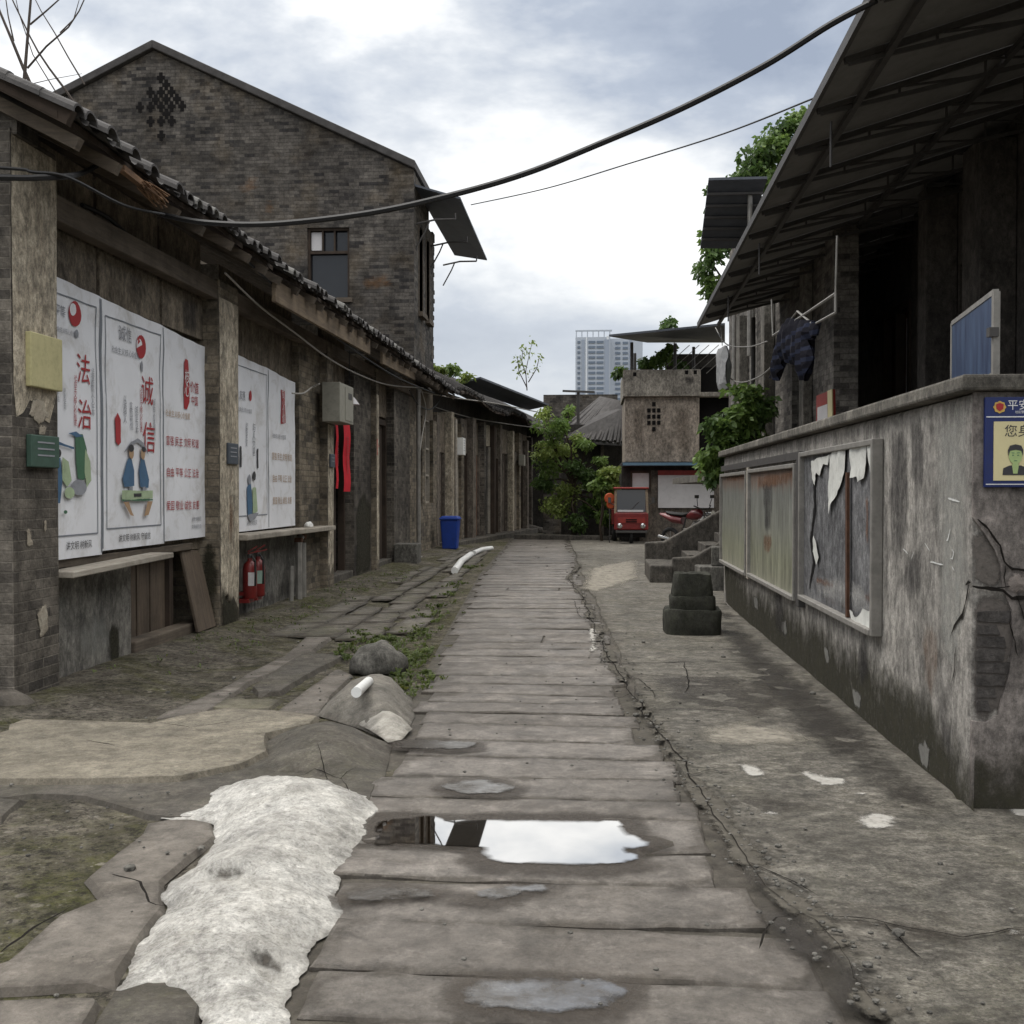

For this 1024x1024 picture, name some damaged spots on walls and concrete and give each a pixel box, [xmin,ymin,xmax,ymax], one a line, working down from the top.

flaking render [29,399,49,435]
water stain [891,428,923,544]
flaking render [37,604,49,637]
water stain [669,565,1024,811]
crack [950,519,1024,680]
spalling [972,535,1024,721]
crack [566,564,1022,1019]